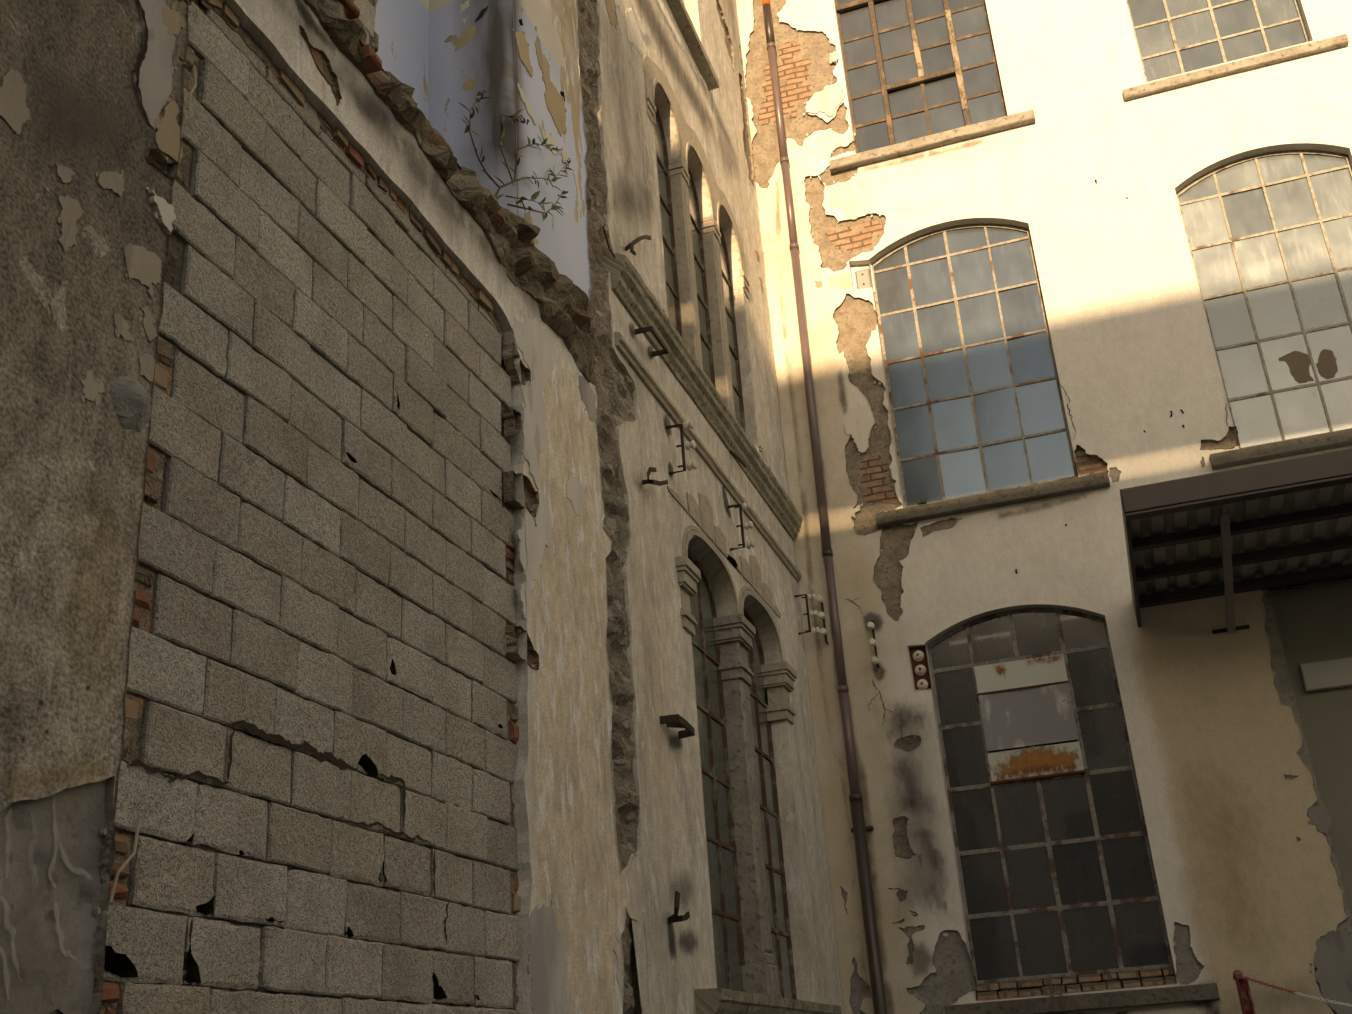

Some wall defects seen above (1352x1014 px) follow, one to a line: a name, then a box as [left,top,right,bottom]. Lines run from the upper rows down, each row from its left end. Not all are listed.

crack [132,0,156,144]
peeling [512,26,579,194]
peeling [132,0,558,670]
spalling [716,0,962,621]
flaking render [507,701,519,745]
spalling [0,776,131,1014]
crack [122,720,449,944]
flaking render [510,871,521,916]
spalling [849,957,872,1014]
spalling [893,918,925,964]
spalling [906,922,1205,1014]
peeling [1309,929,1352,1014]